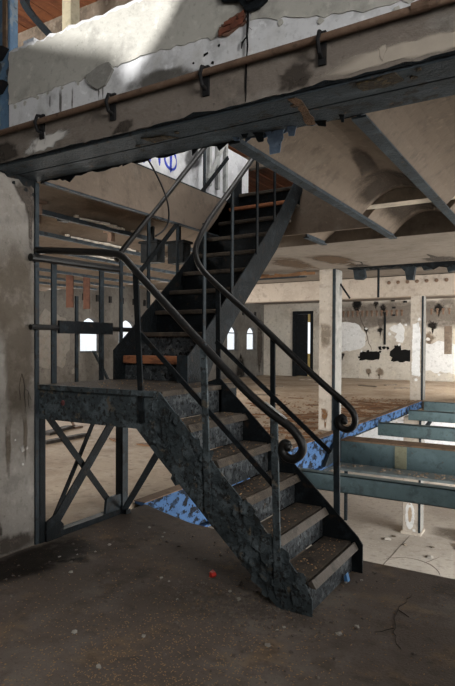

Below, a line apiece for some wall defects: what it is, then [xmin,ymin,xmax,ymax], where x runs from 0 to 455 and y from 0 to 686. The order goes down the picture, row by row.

peeling [8,0,414,109]
spalling [0,50,455,197]
water stain [280,64,309,90]
peeling [342,318,455,381]